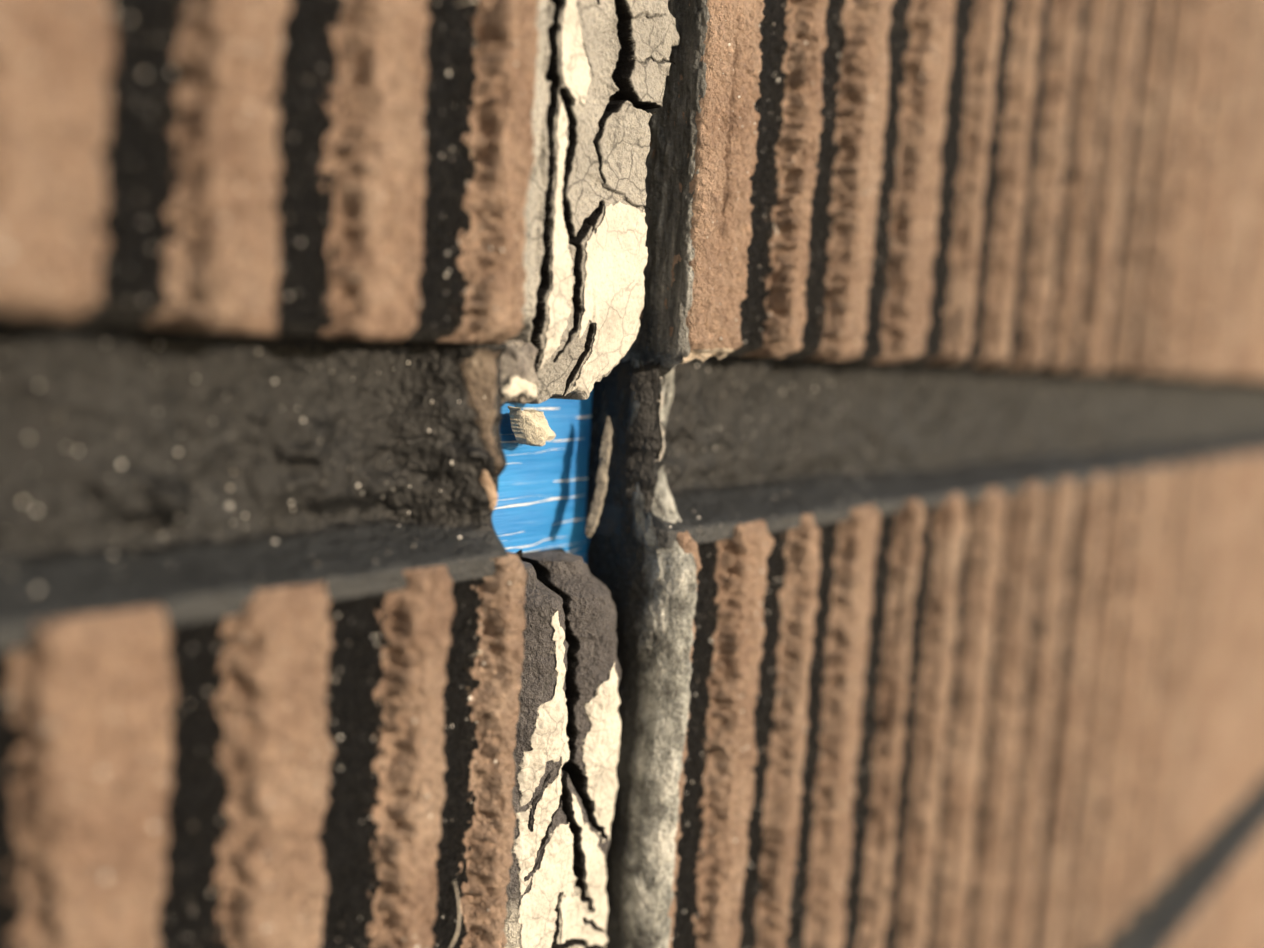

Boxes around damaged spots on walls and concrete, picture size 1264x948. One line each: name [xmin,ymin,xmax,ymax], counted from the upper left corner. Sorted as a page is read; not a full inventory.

crack [583,43,656,115]
crack [551,920,610,948]